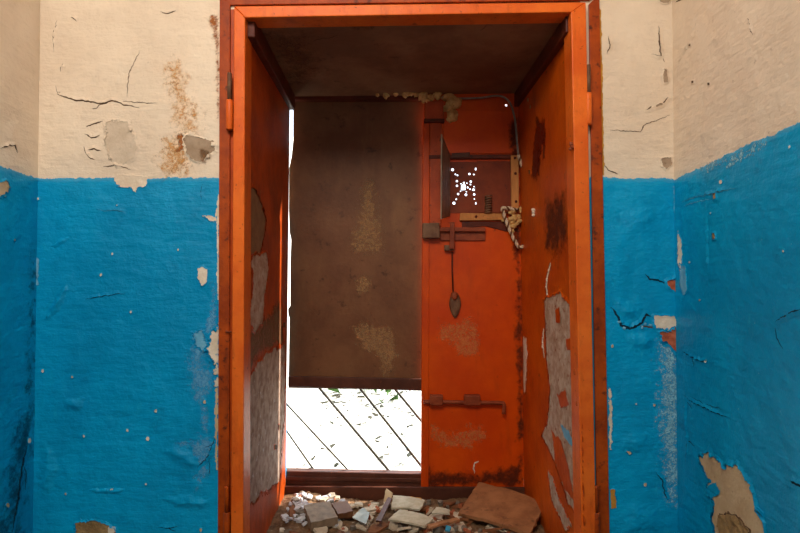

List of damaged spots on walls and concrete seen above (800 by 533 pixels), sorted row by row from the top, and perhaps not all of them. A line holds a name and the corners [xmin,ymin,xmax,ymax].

crack [56,50,148,109]
crack [612,97,670,132]
spalling [177,131,218,164]
rust [532,117,546,177]
peeling [195,194,219,300]
rust [546,193,567,250]
spalling [611,305,677,356]
peeling [190,321,219,470]
peeling [541,263,585,532]
leakage [664,348,677,409]
rust [428,459,522,487]
spalling [697,445,767,533]